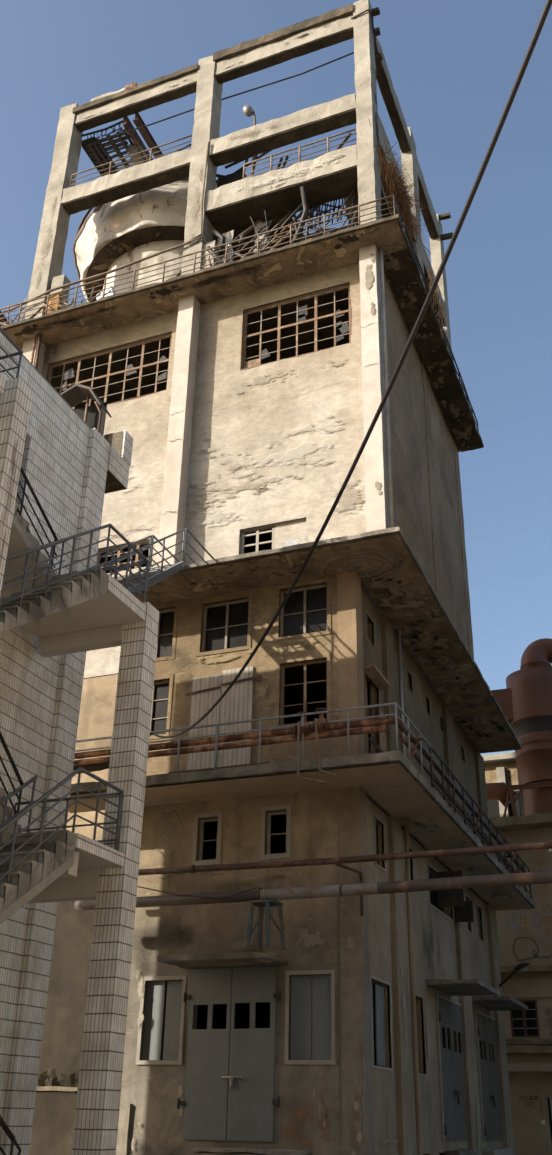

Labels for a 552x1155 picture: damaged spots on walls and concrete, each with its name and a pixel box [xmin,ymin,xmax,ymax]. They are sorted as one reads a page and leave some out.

flaking render [365,252,472,448]